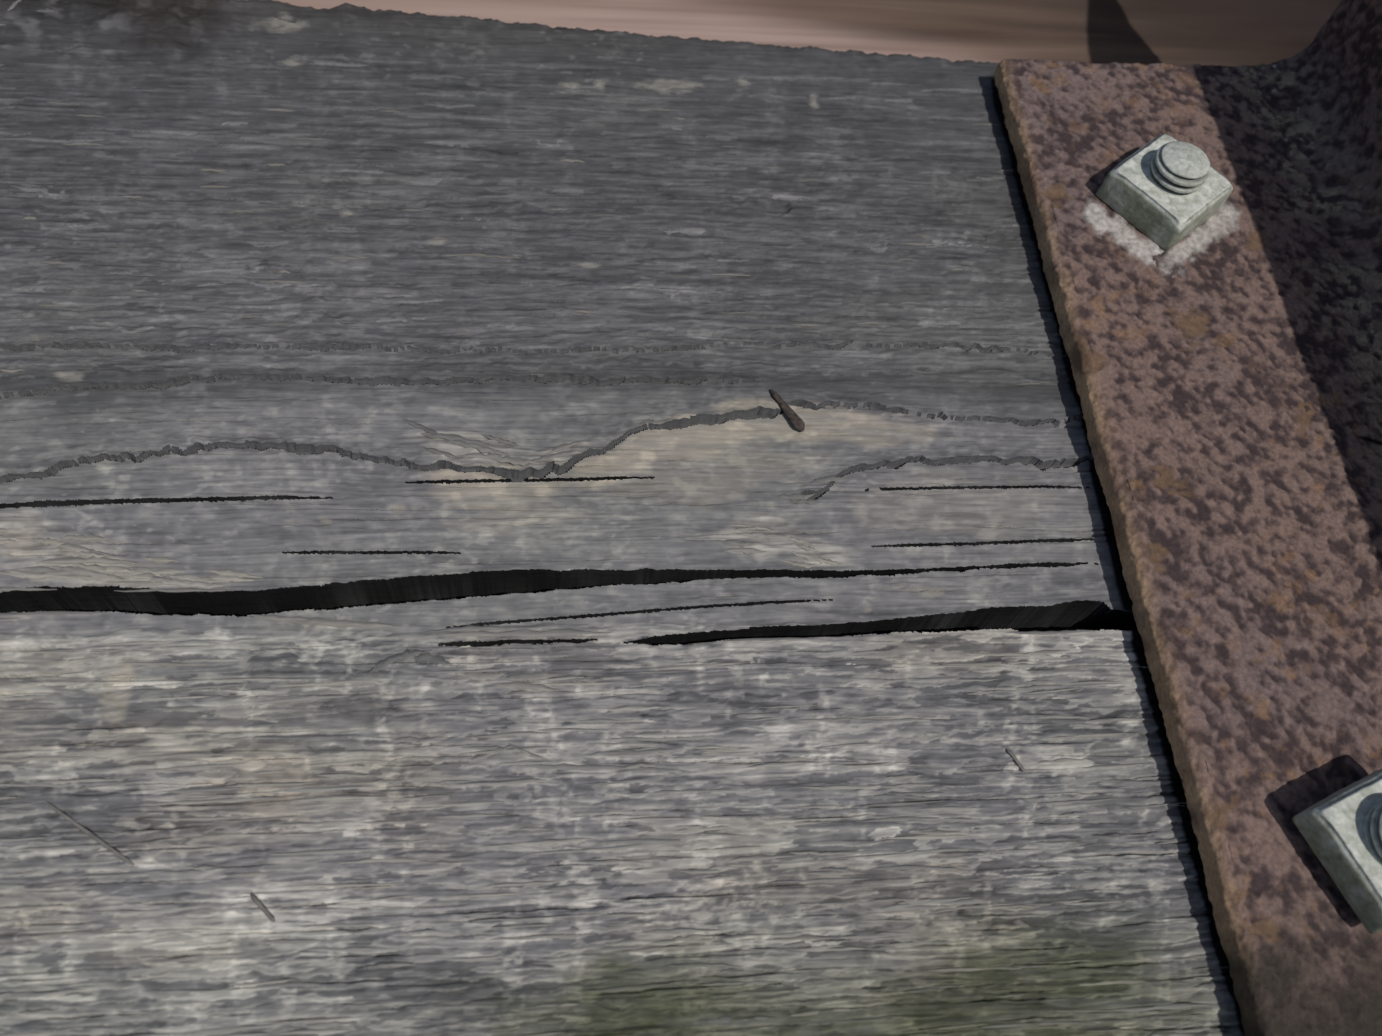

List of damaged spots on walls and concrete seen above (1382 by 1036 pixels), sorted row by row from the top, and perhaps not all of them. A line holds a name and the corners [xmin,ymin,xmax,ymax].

rust [1085,204,1238,273]
crack [0,340,1094,509]
rust [992,78,1133,611]
crack [0,537,1137,647]
rust [1131,629,1245,1036]